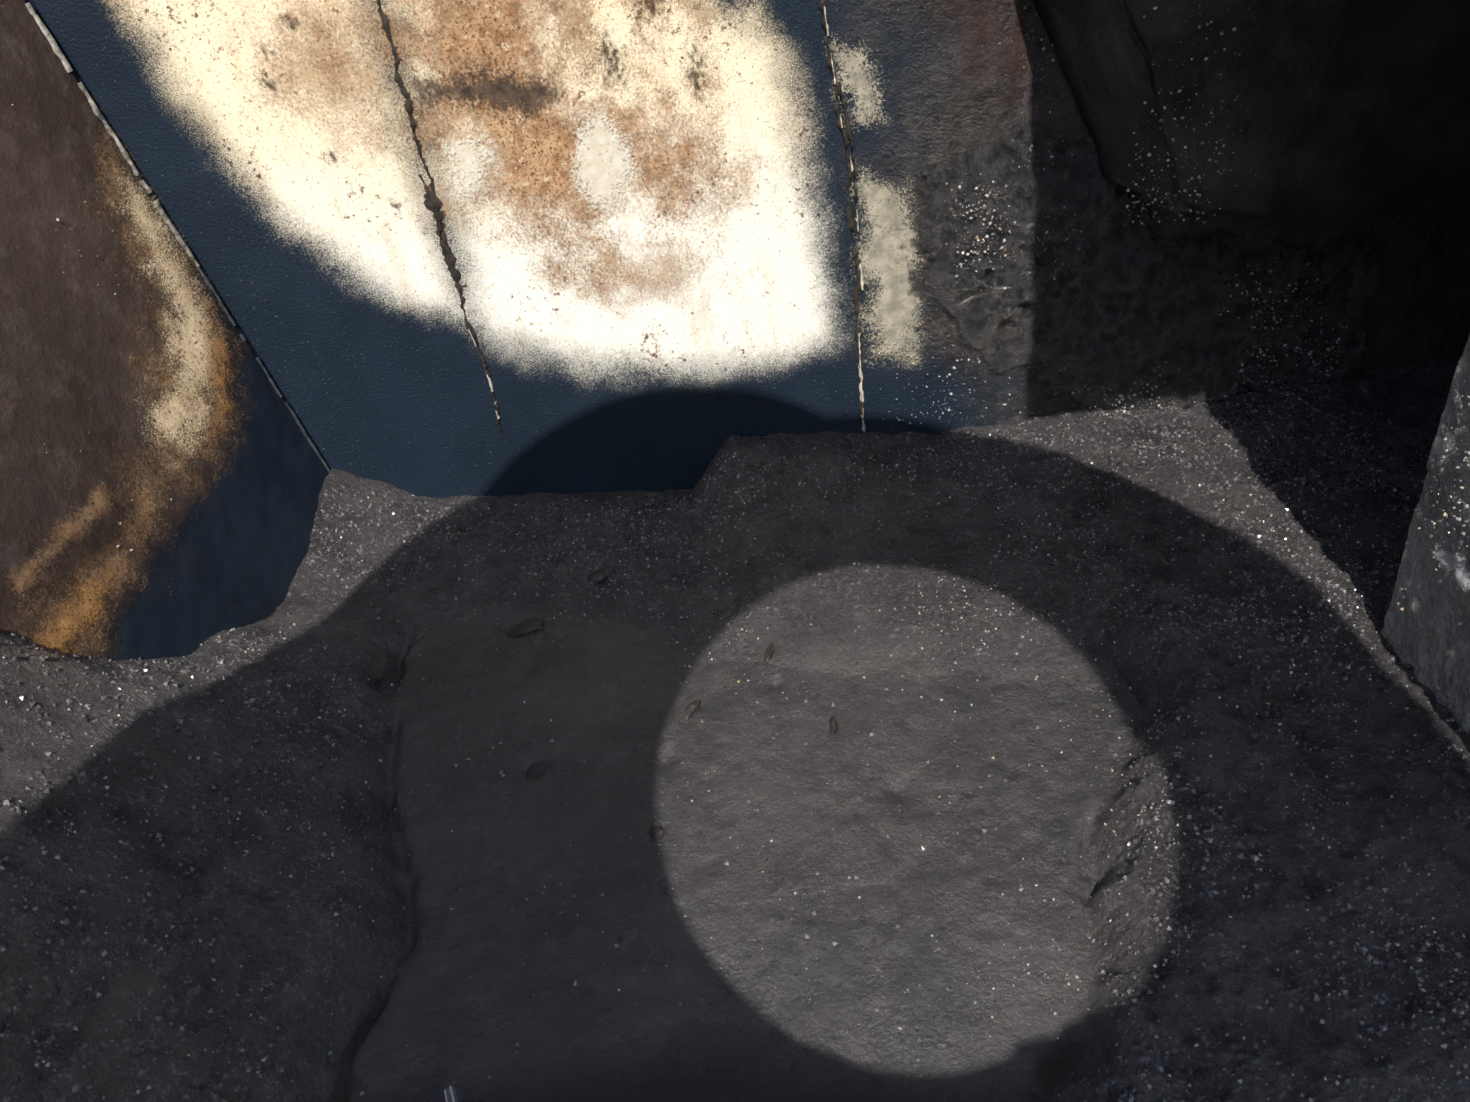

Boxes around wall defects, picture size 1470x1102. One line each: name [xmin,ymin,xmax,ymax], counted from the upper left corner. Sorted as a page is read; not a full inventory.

damp [58,41,159,200]
rust [9,125,249,659]
damp [95,223,331,660]
crack [376,0,502,435]
damp [408,57,564,119]
rust [253,0,753,302]
peeling [116,0,930,383]
crack [819,0,866,433]